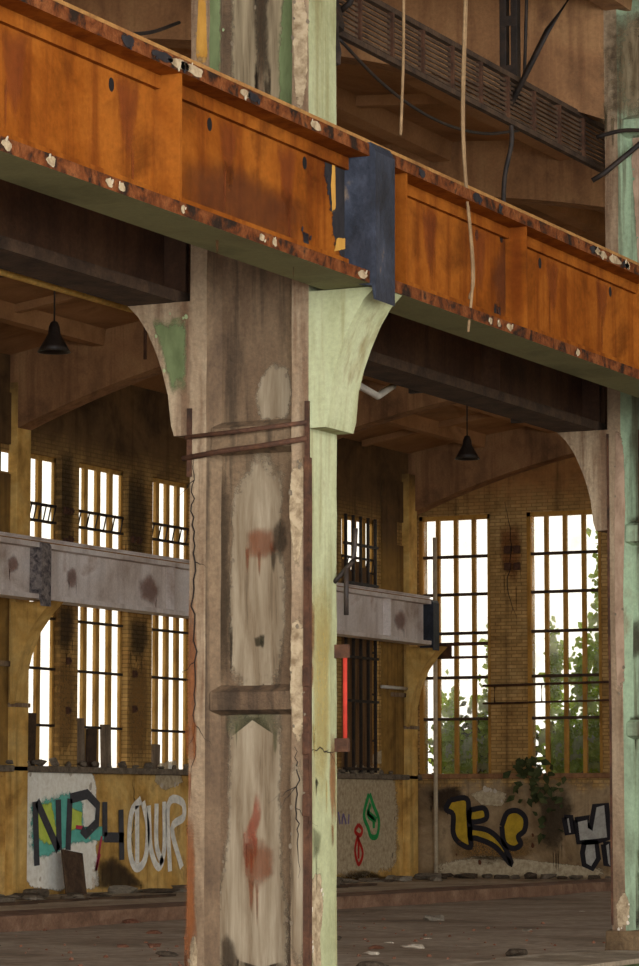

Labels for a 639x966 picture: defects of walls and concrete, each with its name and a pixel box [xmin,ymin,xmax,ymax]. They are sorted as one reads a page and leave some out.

peeling [154,312,188,389]
peeling [256,363,292,420]